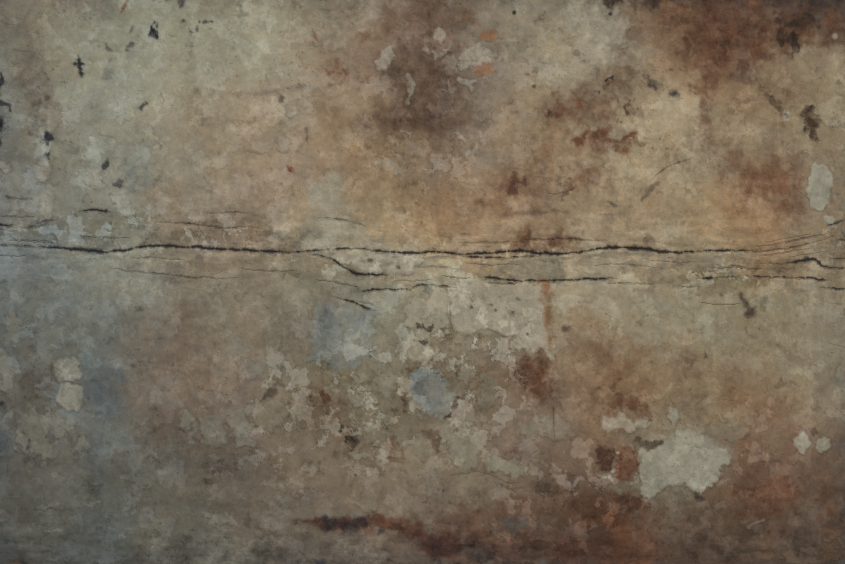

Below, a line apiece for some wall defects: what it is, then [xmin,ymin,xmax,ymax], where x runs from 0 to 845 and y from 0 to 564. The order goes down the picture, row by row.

leakage [0,12,58,162]
leakage [70,53,86,79]
leakage [146,19,161,42]
corrosion [274,0,845,275]
leakage [0,183,58,424]
crack [81,206,112,214]
crack [0,210,845,311]
peeling [411,289,493,387]
peeling [346,344,413,480]
peeling [415,395,480,456]
peeling [479,444,529,484]
corrosion [287,275,770,564]